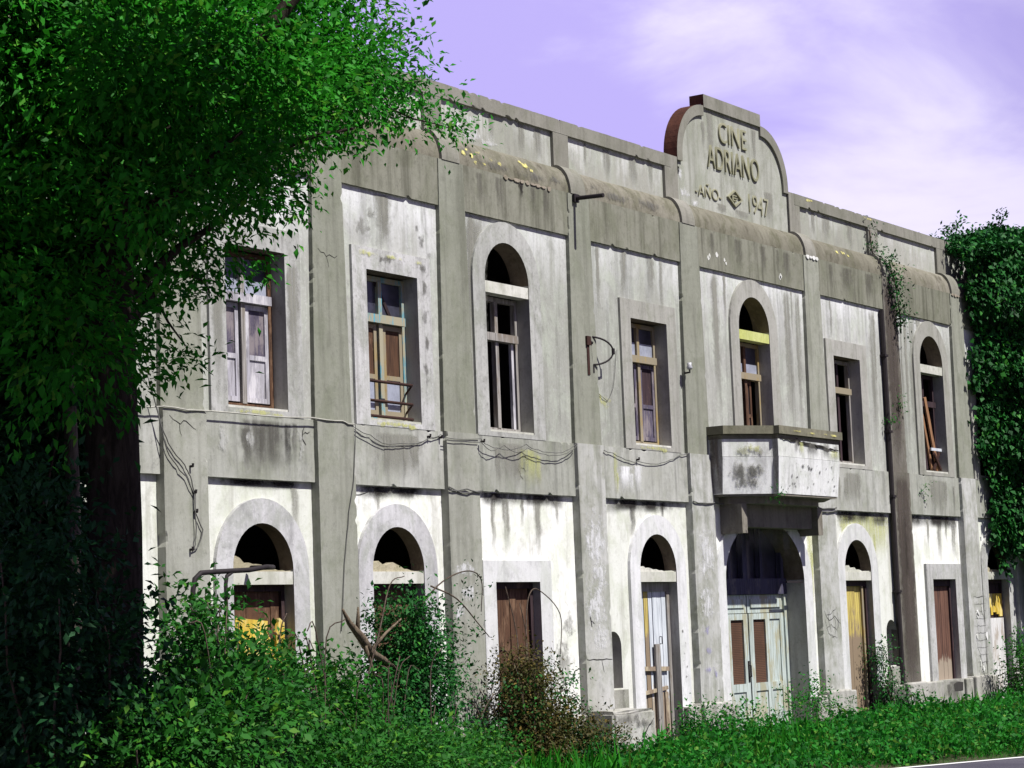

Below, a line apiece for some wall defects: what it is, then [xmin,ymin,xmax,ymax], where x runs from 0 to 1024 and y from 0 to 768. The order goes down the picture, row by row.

damp [734,447,763,485]
damp [484,493,558,533]
damp [838,512,885,551]